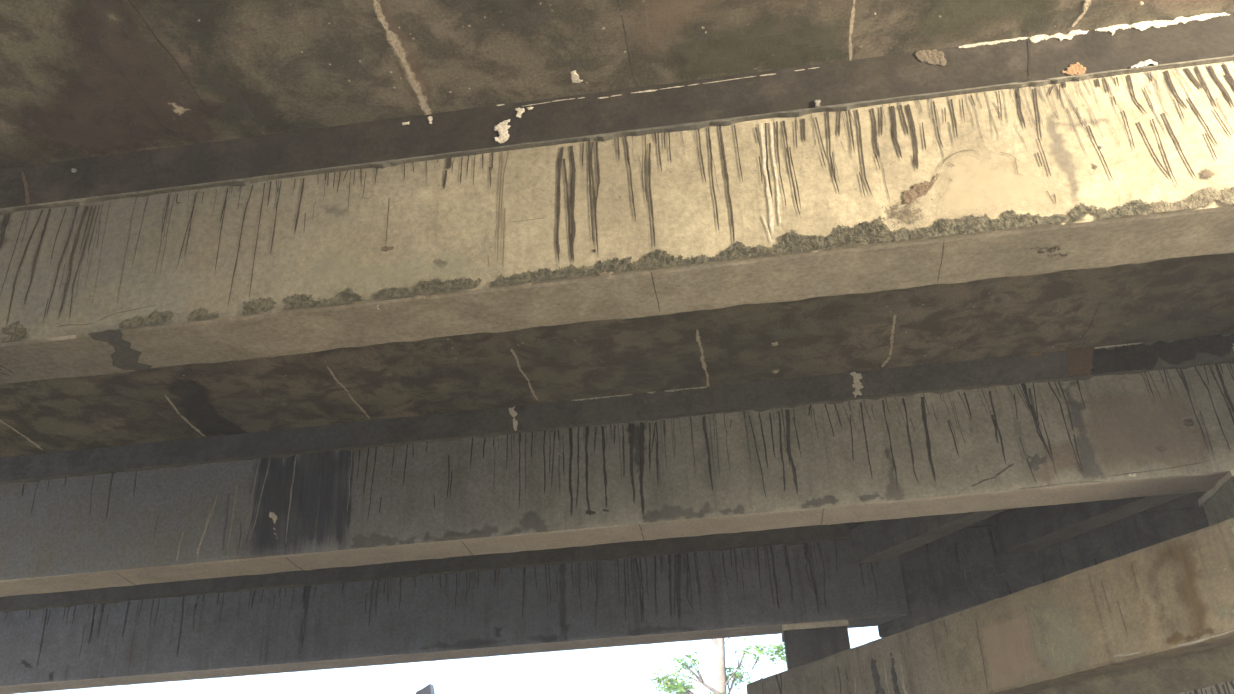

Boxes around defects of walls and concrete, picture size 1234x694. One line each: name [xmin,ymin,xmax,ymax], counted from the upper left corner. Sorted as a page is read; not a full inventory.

damp [30,0,286,158]
damp [155,168,378,305]
damp [404,151,509,265]
spalling [494,107,534,143]
damp [556,125,743,264]
damp [755,62,1234,243]
damp [470,329,1234,516]
damp [197,447,382,554]
damp [617,540,837,623]
damp [871,653,908,694]
rust [1160,544,1213,644]
damp [1175,629,1234,647]